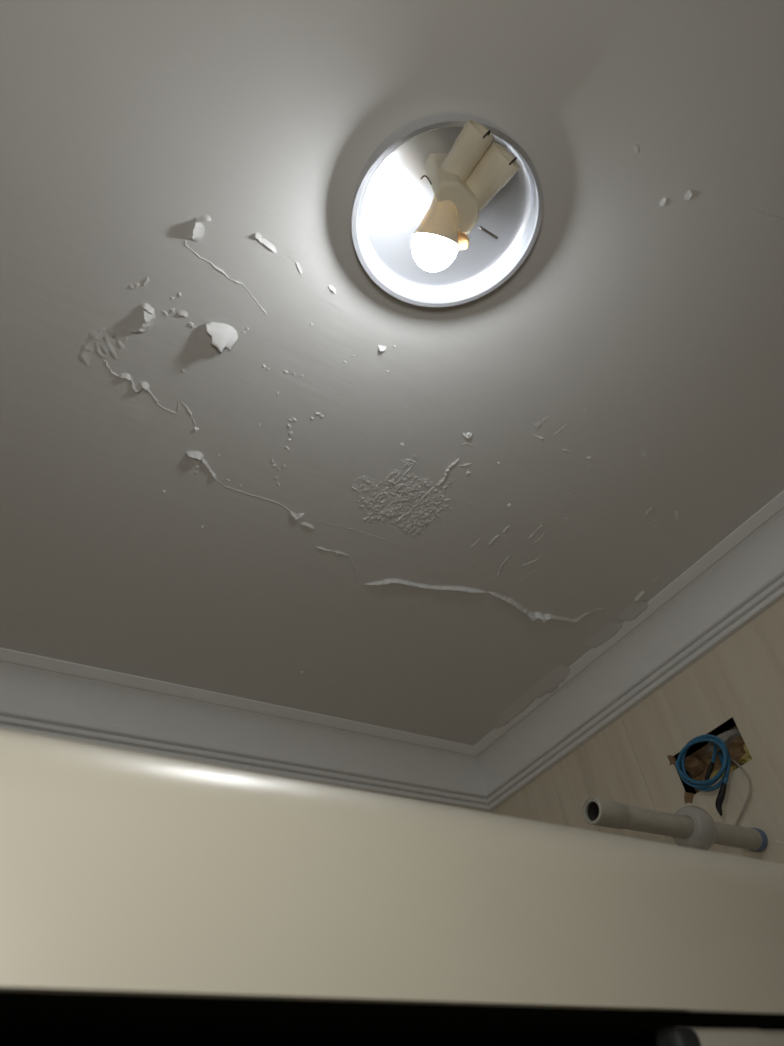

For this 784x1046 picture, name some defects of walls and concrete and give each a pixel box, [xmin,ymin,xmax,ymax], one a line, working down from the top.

peeling [185,214,268,317]
peeling [78,292,249,369]
peeling [186,451,315,529]
peeling [350,432,475,538]